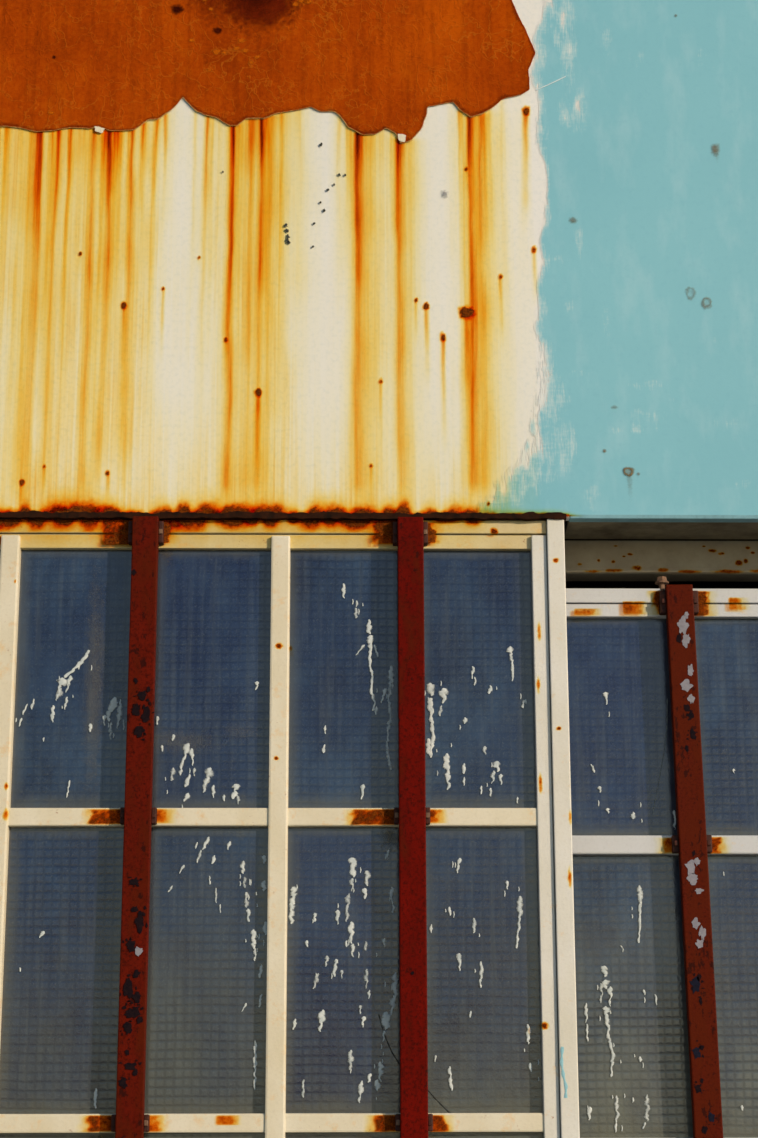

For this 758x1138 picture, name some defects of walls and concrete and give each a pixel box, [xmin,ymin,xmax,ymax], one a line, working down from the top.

corrosion [0,0,535,305]
corrosion [460,227,476,407]
corrosion [721,547,758,573]
corrosion [694,591,709,616]
corrosion [352,809,394,825]
corrosion [712,837,722,853]